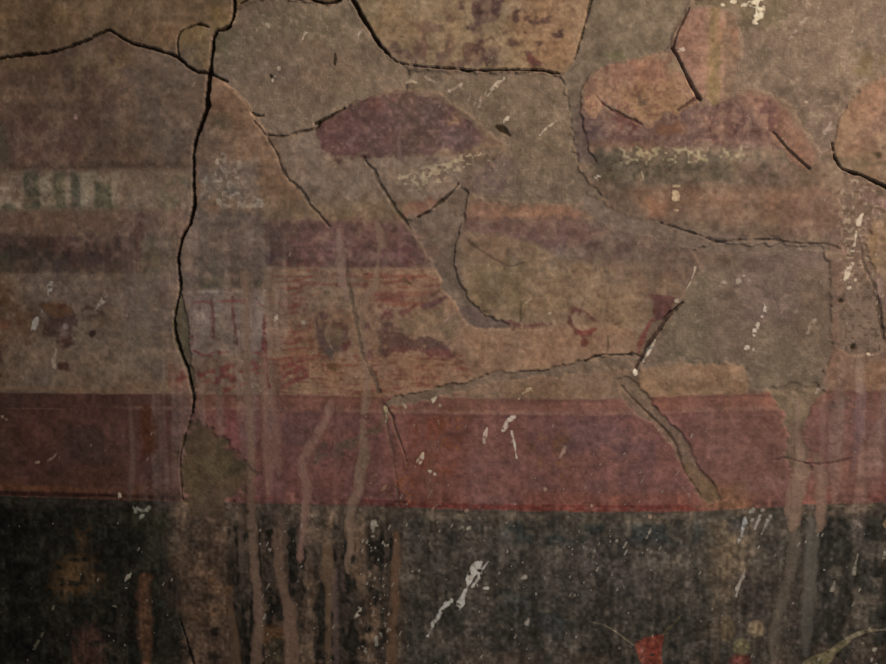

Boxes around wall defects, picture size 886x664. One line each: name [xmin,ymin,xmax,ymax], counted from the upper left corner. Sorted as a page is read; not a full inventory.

crack [298,0,593,75]
crack [0,0,249,500]
crack [251,107,408,508]
crack [362,156,459,231]
crack [772,131,810,171]
crack [831,143,886,190]
water stain [169,220,395,664]
water stain [384,529,402,664]